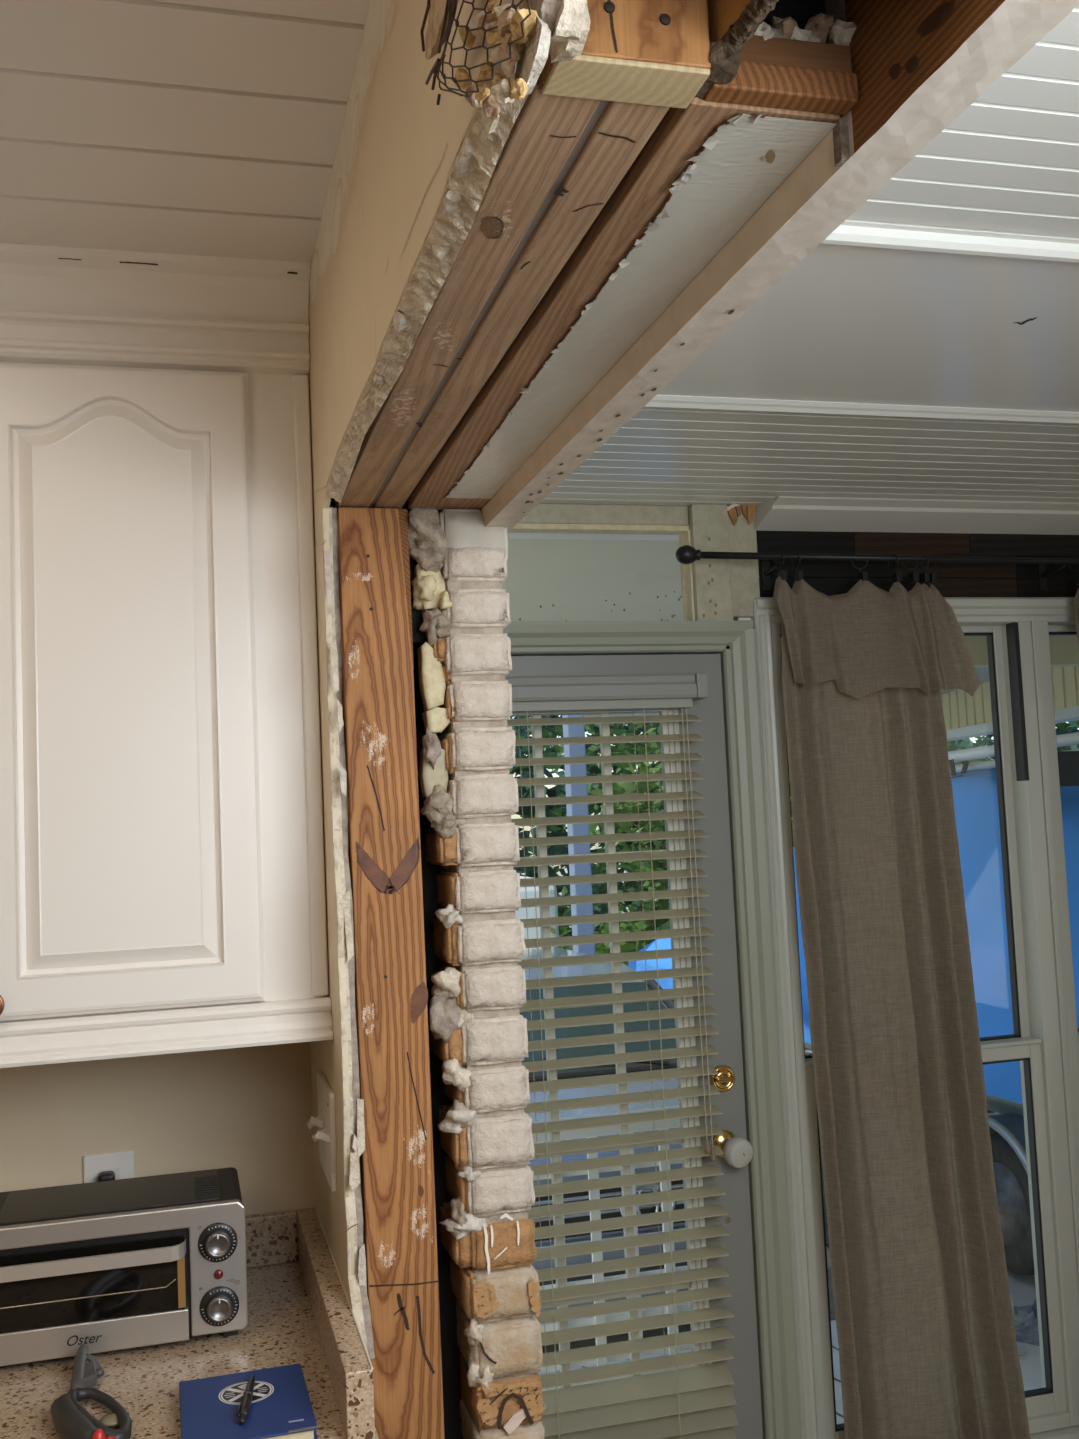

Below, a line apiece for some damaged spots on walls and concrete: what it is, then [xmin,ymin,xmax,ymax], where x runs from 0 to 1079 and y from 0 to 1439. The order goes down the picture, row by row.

flaking render [518,0,591,63]
peeling [444,114,765,498]
spalling [761,150,775,164]
flaking render [313,90,529,1359]
spalling [413,643,546,1439]